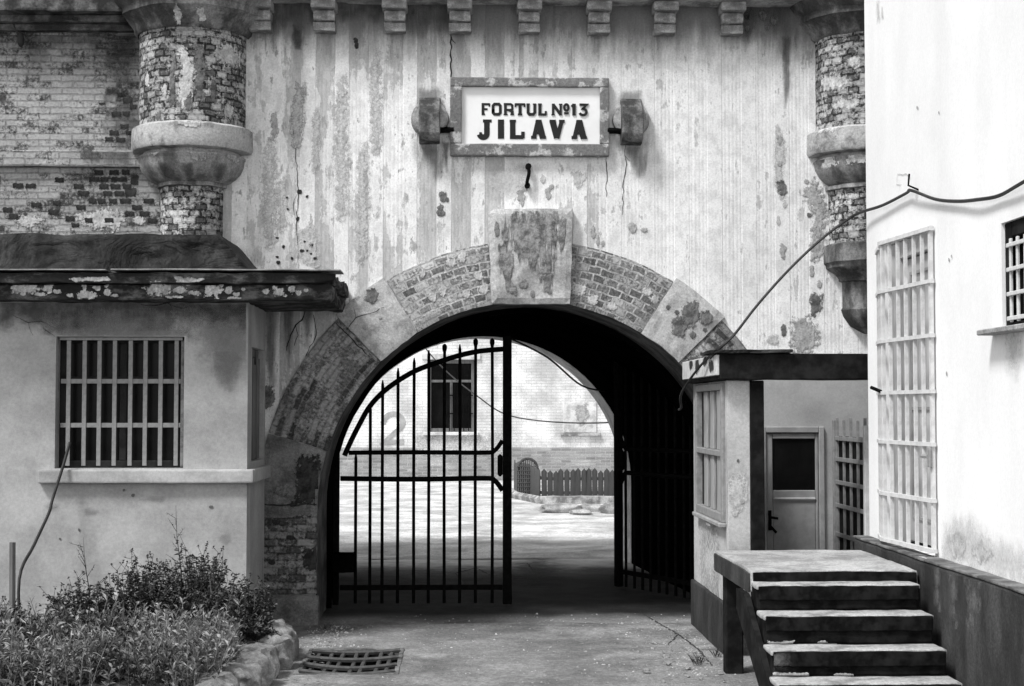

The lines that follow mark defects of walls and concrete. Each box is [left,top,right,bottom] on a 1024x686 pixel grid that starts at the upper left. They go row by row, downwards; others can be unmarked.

peeling [173,3,182,25]
leakage [744,9,789,95]
peeling [155,41,240,127]
flaking render [99,92,137,143]
flaking render [31,169,157,228]
crack [292,132,300,261]
peeling [10,276,118,299]
peeling [141,276,246,300]
peeling [262,285,309,297]